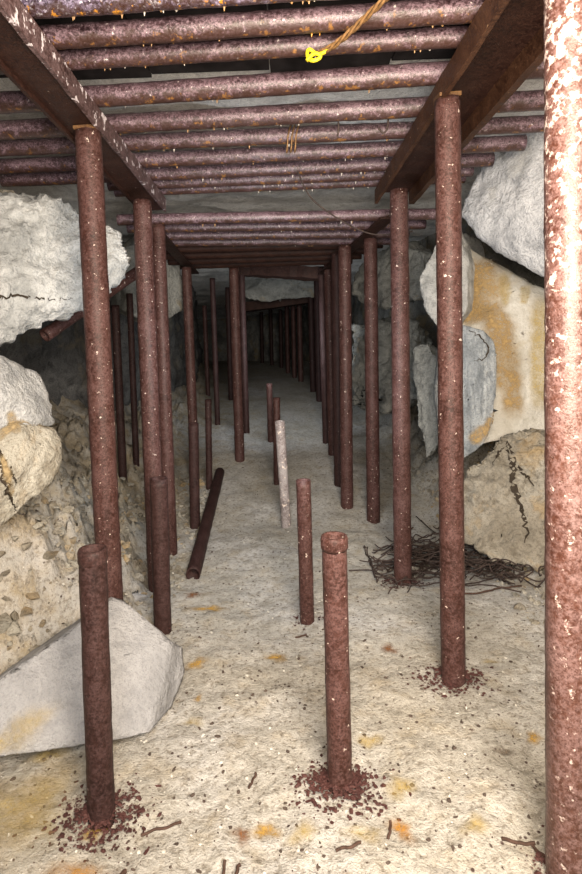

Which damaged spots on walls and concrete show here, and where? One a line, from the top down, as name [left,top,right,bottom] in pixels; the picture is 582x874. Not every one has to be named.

corrosion [402,657,502,707]
corrosion [32,773,162,874]
corrosion [283,744,412,837]